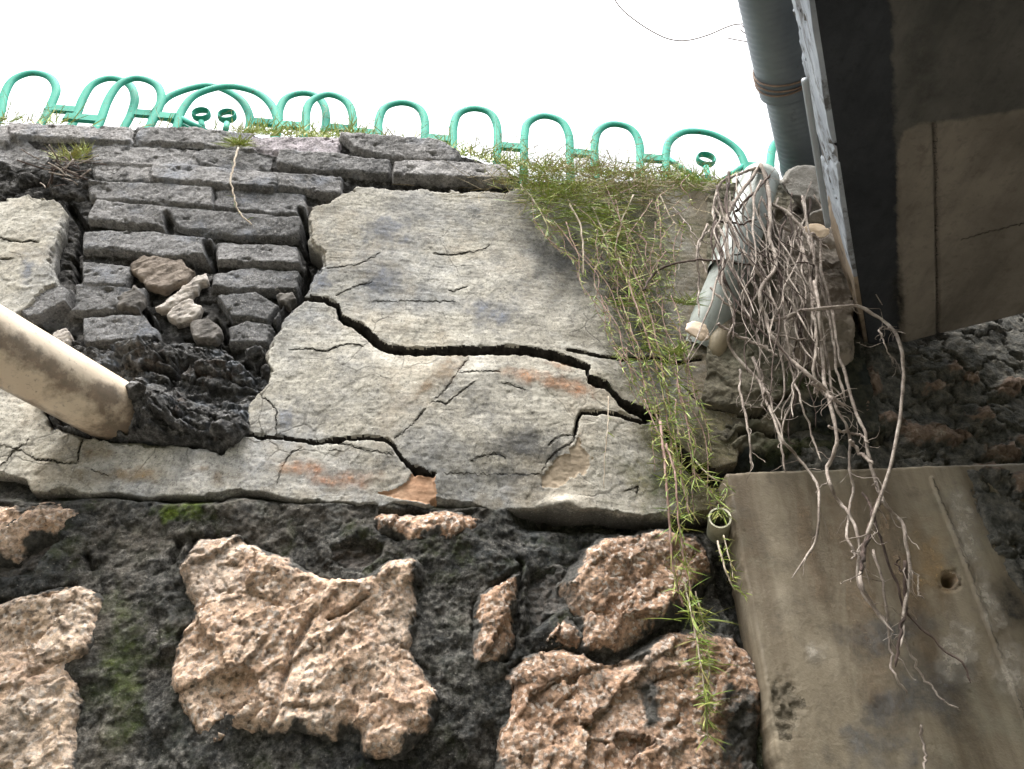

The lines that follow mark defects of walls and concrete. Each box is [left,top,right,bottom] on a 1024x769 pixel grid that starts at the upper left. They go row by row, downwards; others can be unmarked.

crack [0,439,108,476]
spalling [47,255,270,456]
spalling [276,292,297,312]
crack [249,253,776,482]